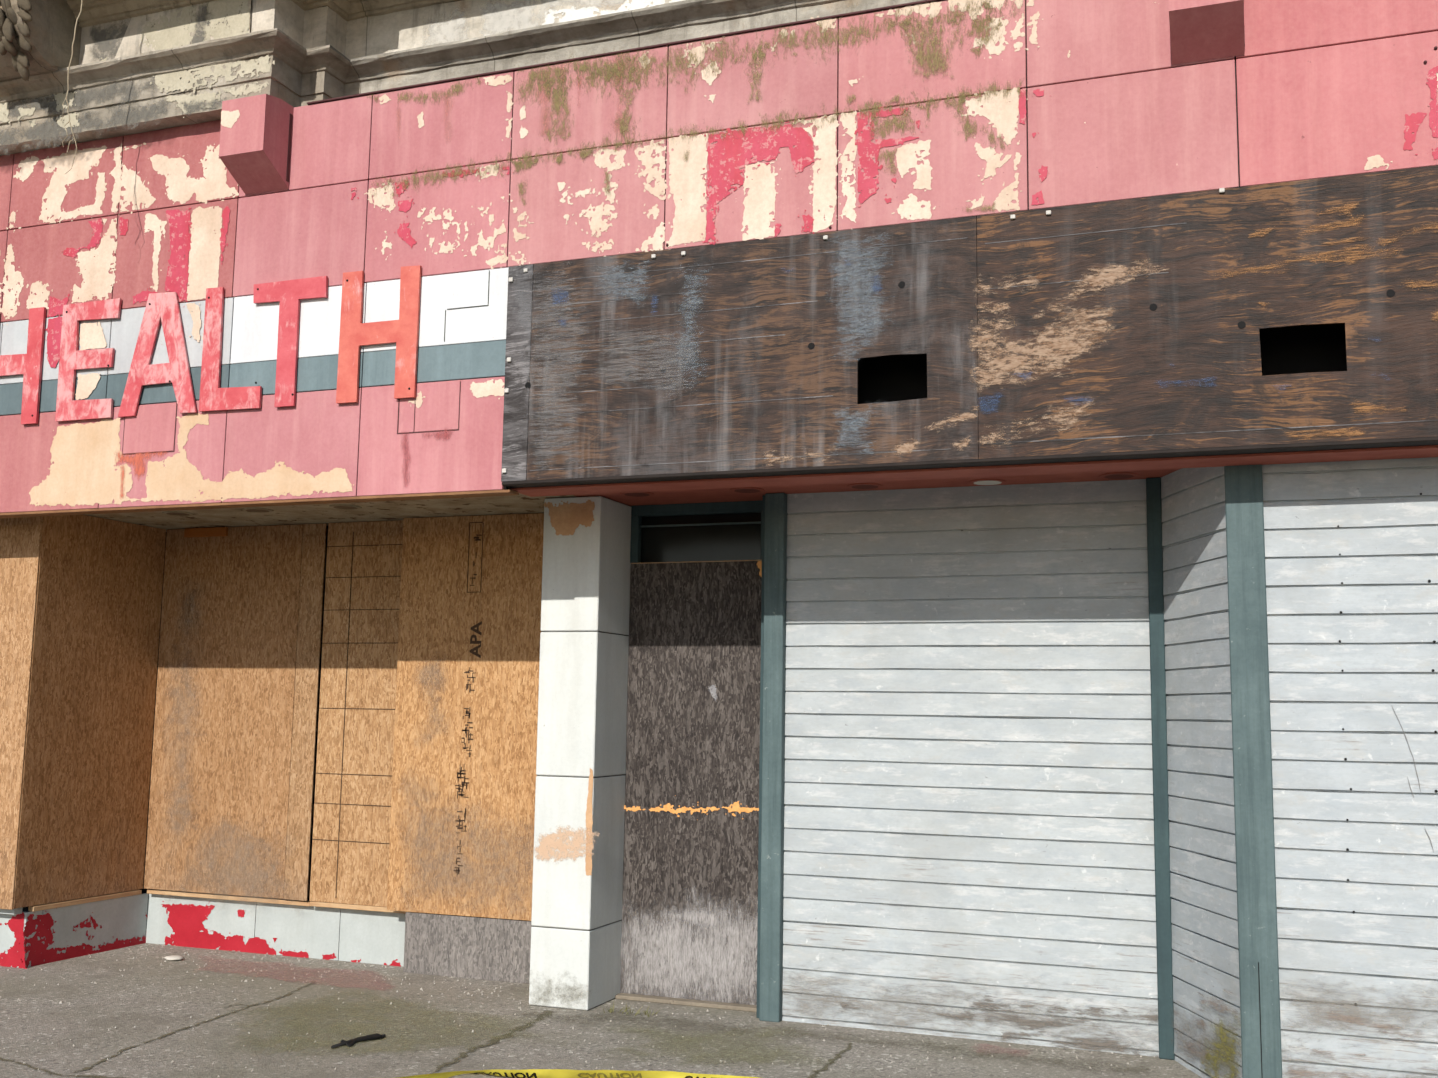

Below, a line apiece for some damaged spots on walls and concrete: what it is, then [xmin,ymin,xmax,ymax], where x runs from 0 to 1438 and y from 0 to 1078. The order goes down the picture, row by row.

damp [377,1,1021,205]
peeling [557,106,936,257]
peeling [962,87,1048,212]
peeling [1364,66,1438,170]
peeling [0,142,239,368]
peeling [970,260,1166,387]
peeling [75,373,101,400]
peeling [29,413,354,507]
peeling [544,500,595,536]
peeling [535,768,598,876]
peeling [0,911,146,969]
peeling [161,901,361,962]